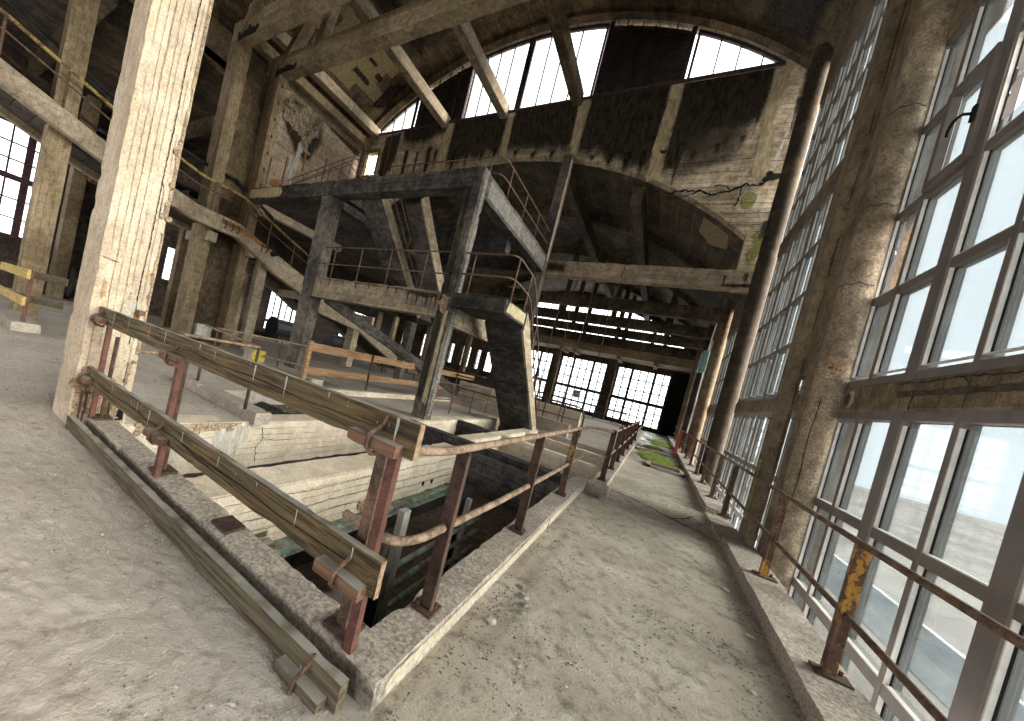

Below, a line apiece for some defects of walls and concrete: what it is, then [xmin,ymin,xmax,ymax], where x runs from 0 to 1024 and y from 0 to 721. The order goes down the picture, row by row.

spalling [274,62,321,156]
water stain [378,128,467,177]
water stain [606,99,696,183]
crack [664,138,790,225]
crack [899,370,1024,411]
crack [792,397,822,497]